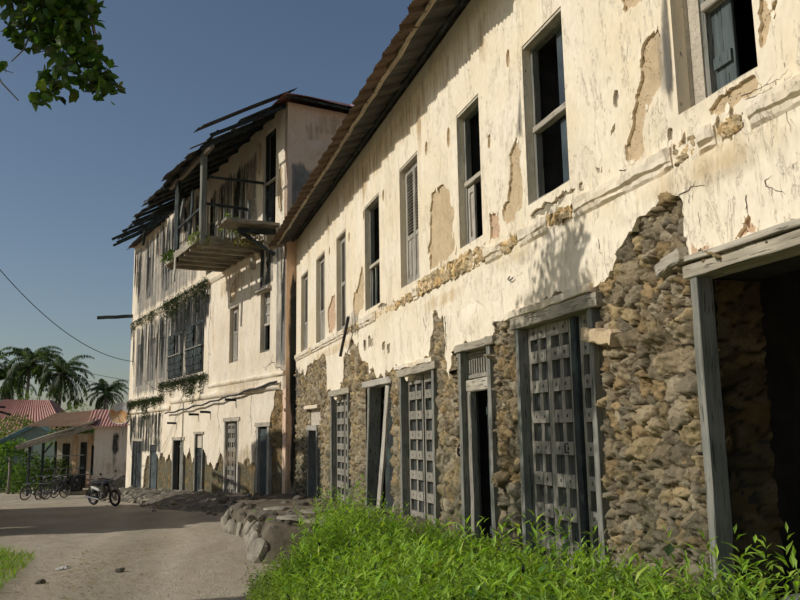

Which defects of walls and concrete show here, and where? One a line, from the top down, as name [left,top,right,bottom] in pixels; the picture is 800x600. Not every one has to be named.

peeling [622,0,642,10]
damp [660,0,671,94]
peeling [761,0,777,45]
peeling [626,24,663,160]
peeling [711,76,762,127]
damp [210,155,257,238]
peeling [428,185,457,270]
peeling [482,137,523,255]
damp [132,198,208,395]